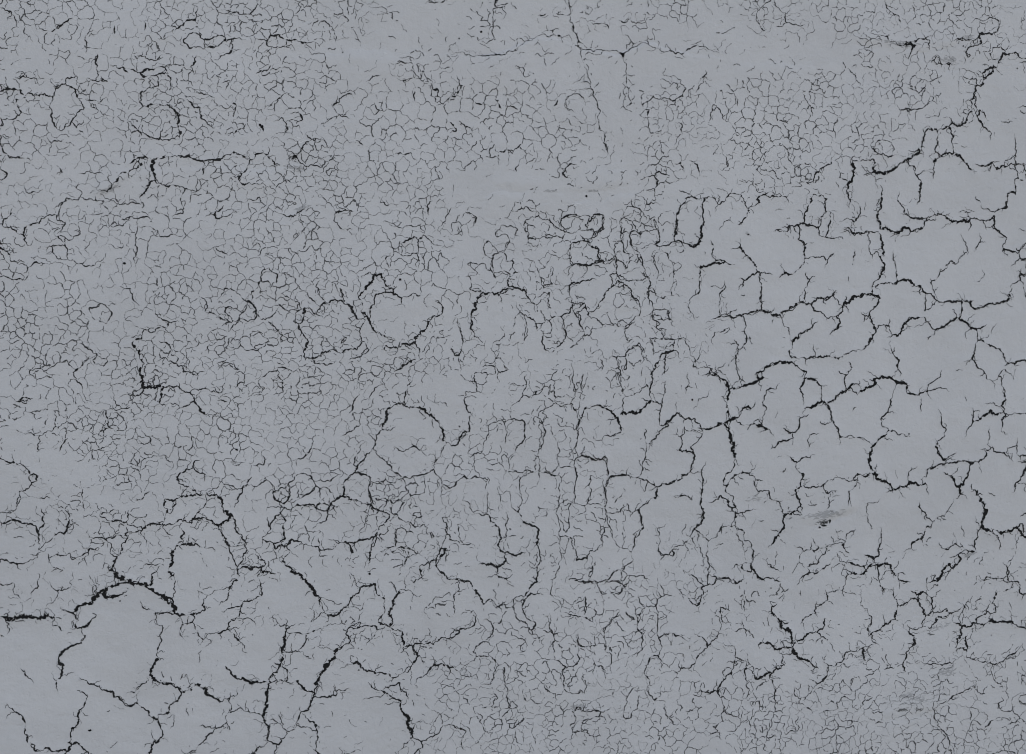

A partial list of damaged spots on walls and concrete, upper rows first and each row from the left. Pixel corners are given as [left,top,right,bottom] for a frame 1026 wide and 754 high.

crack [464,0,559,65]
crack [683,242,735,318]